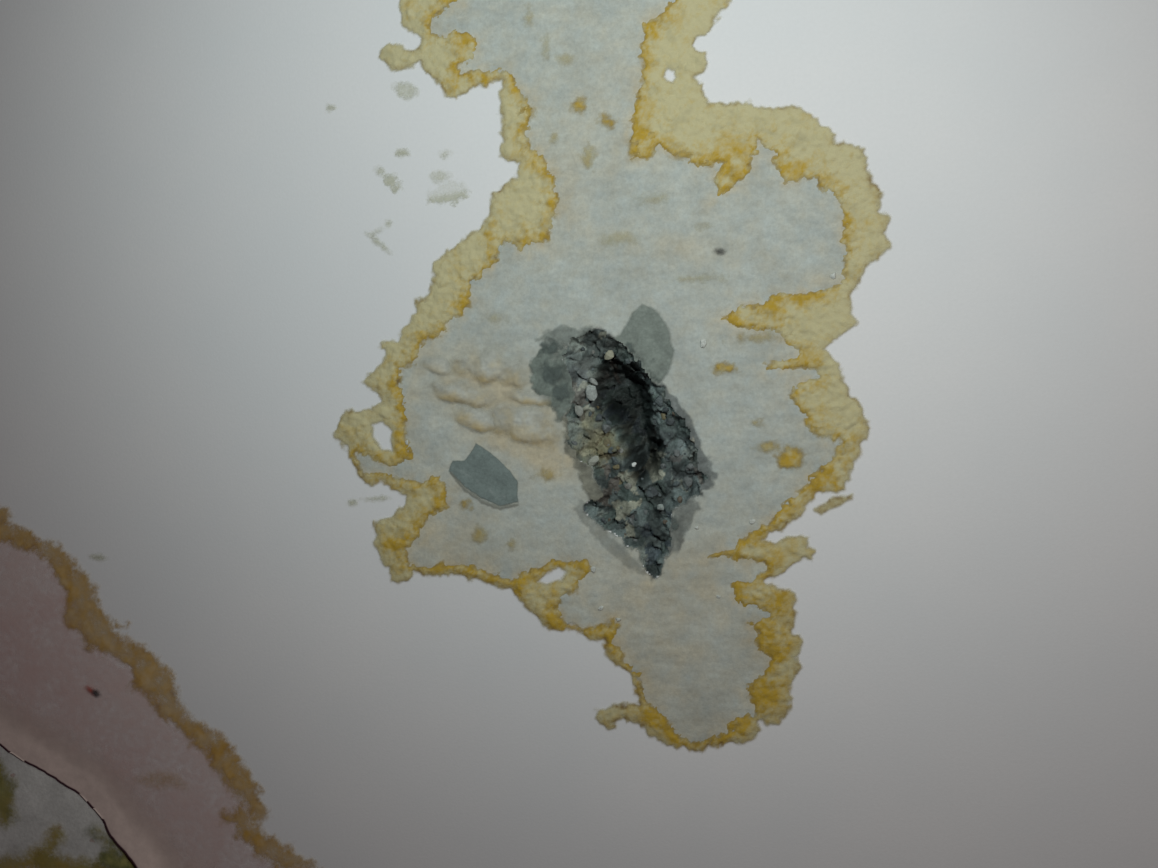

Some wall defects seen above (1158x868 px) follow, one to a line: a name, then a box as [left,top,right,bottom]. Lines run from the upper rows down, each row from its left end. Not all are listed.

flaking render [449,444,518,509]
damp [334,0,891,751]
spalling [529,305,717,579]
damp [0,508,314,868]